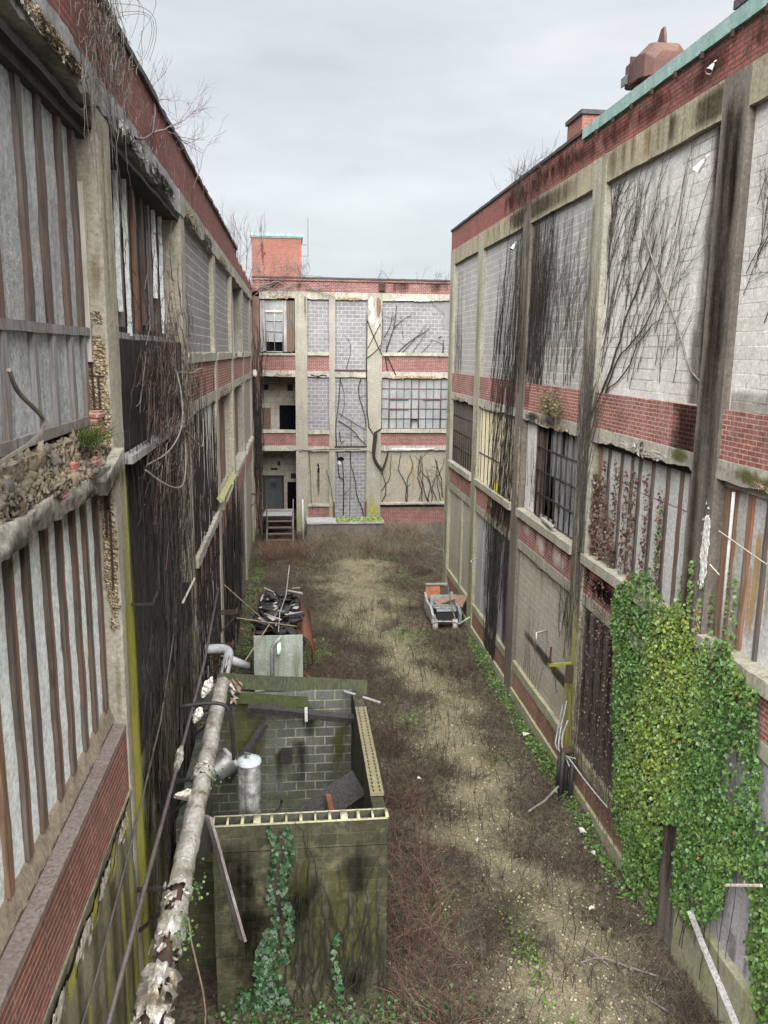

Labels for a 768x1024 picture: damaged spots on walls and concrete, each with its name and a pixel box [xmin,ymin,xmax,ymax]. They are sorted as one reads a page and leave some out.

spalling [17,0,90,85]
leakage [673,126,738,452]
leakage [126,547,199,967]
leakage [243,909,263,959]
leakage [286,890,315,926]